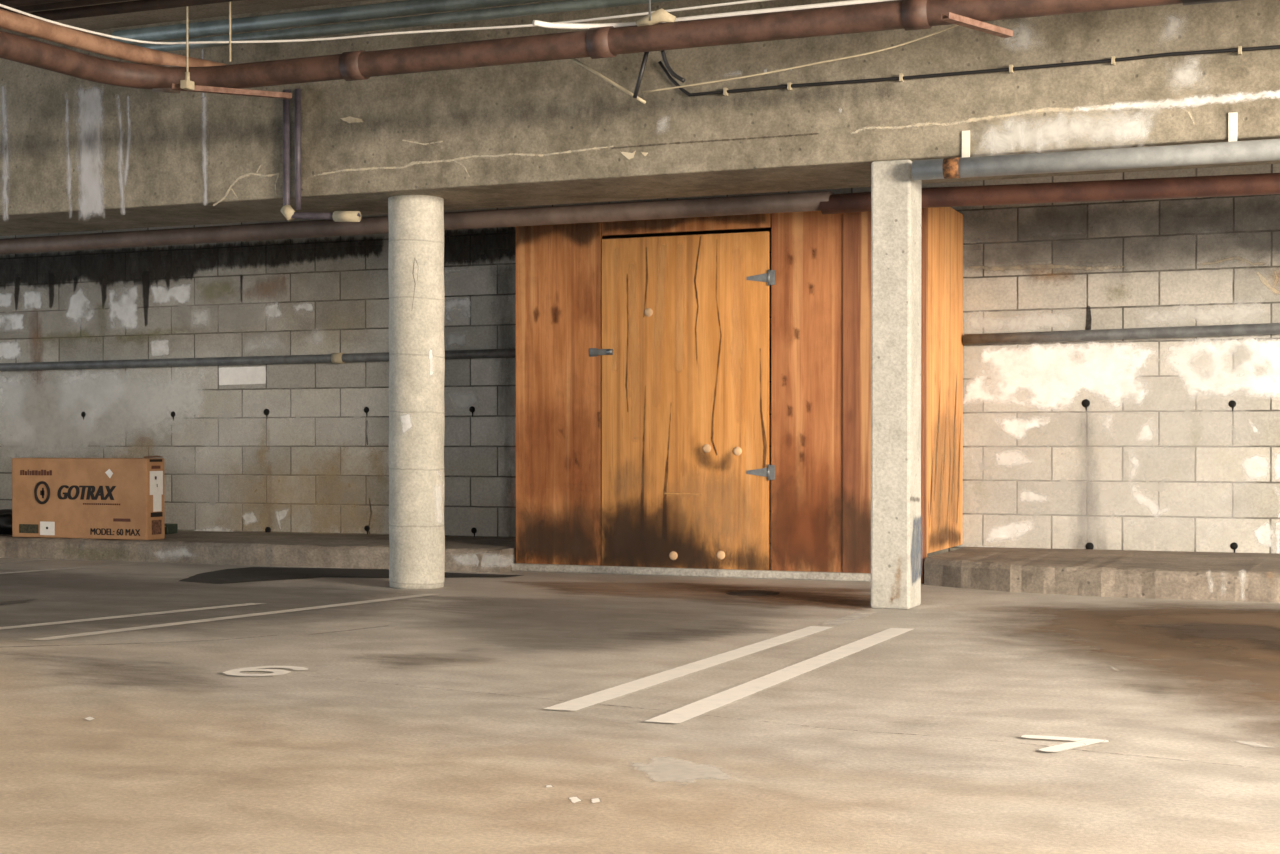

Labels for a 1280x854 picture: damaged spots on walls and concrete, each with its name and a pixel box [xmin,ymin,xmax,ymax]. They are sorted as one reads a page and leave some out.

water stain [66,88,103,217]
water stain [118,97,130,213]
water stain [1167,338,1280,397]
water stain [930,306,1152,547]
water stain [1243,454,1280,479]
water stain [180,567,389,584]
water stain [445,555,523,577]
water stain [520,504,717,567]
water stain [543,583,871,609]
water stain [776,475,871,570]
water stain [1254,513,1280,553]
water stain [1020,605,1280,724]